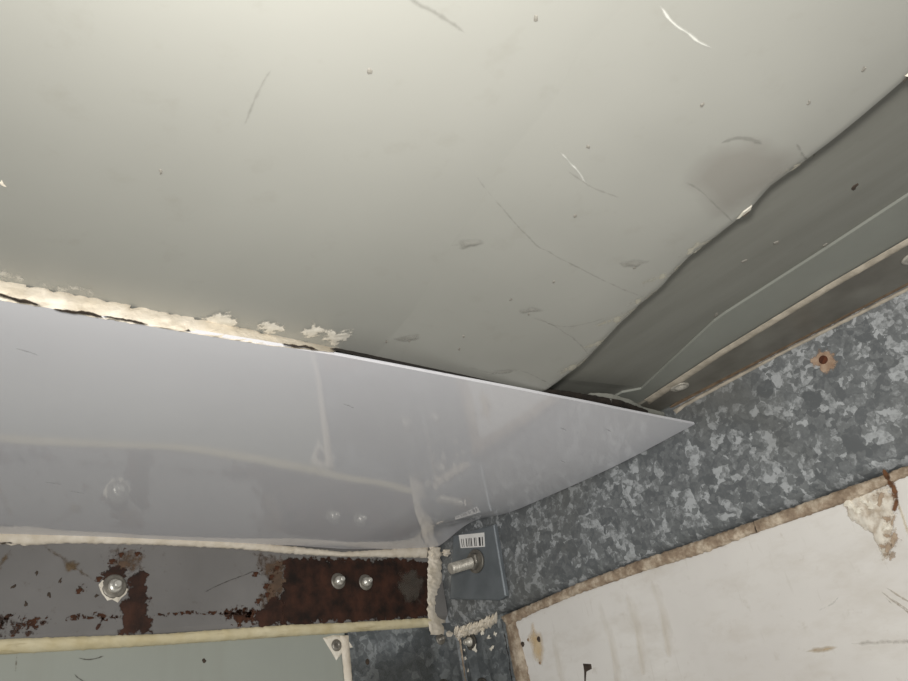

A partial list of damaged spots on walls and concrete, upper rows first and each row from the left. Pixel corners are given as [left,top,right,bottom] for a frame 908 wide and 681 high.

corrosion [811,350,837,372]
spalling [844,487,898,561]
corrosion [0,614,48,637]
corrosion [65,548,429,635]